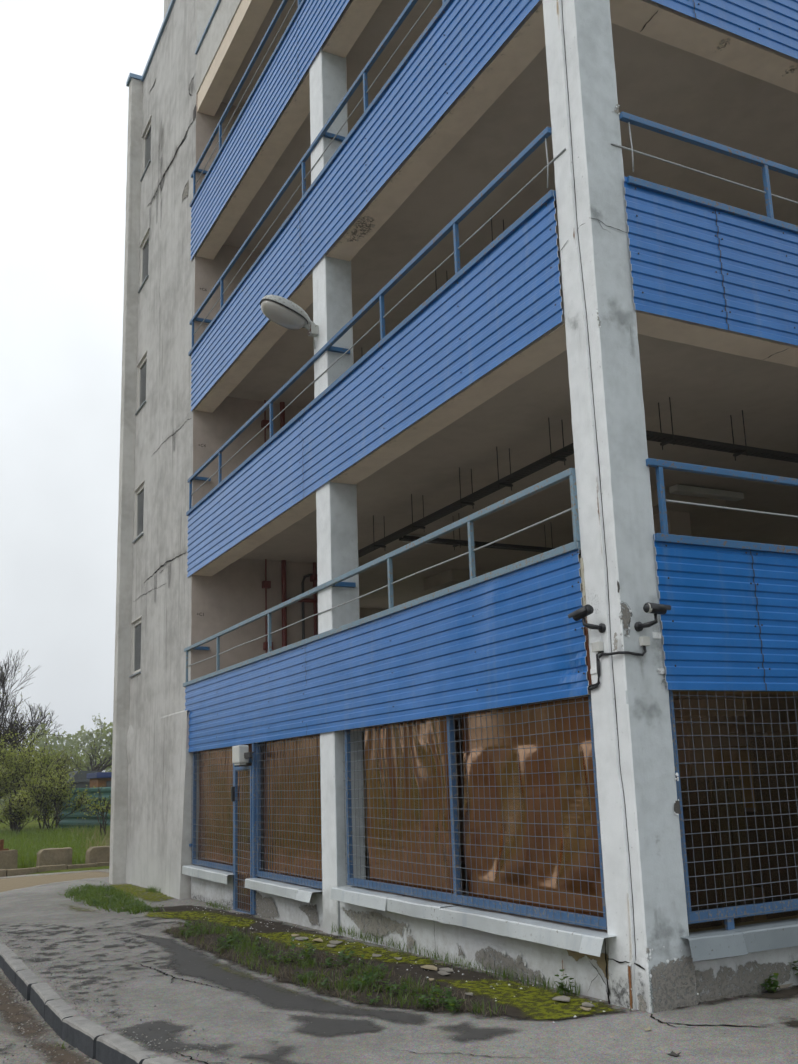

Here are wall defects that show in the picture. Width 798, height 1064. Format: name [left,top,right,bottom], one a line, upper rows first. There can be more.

crack [147,122,193,207]
crack [133,553,185,602]
peeling [299,903,319,926]
peeling [341,906,414,949]
peeling [456,943,543,983]
peeling [565,949,609,980]
crack [588,938,645,1004]
peeling [637,948,792,1013]